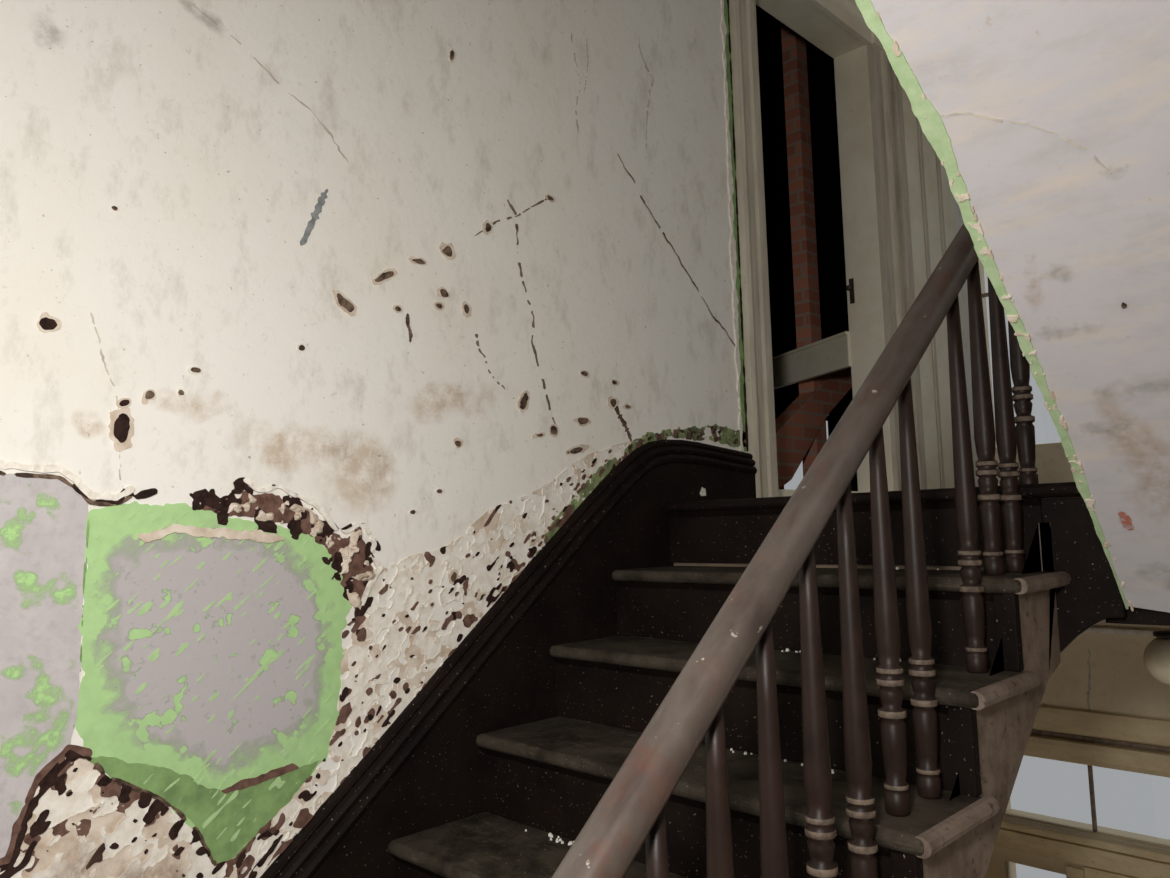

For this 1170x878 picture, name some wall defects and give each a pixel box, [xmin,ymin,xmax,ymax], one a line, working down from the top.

peeling [0,0,748,878]
crack [475,198,556,424]
crack [617,35,735,346]